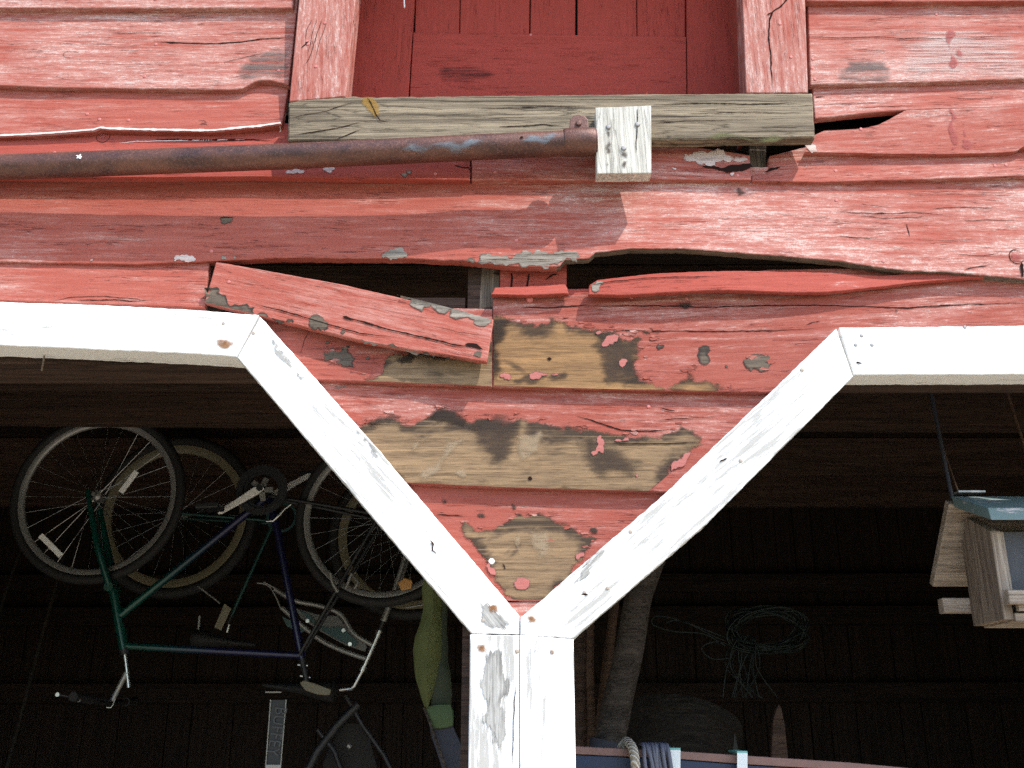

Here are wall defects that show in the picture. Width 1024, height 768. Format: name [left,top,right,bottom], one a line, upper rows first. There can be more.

crack [636,0,794,150]
peeling [672,148,748,176]
crack [839,207,1017,239]
peeling [204,287,305,379]
peeling [309,296,732,391]
peeling [743,354,775,372]
peeling [356,404,702,491]
peeling [461,504,611,602]
peeling [476,649,510,751]